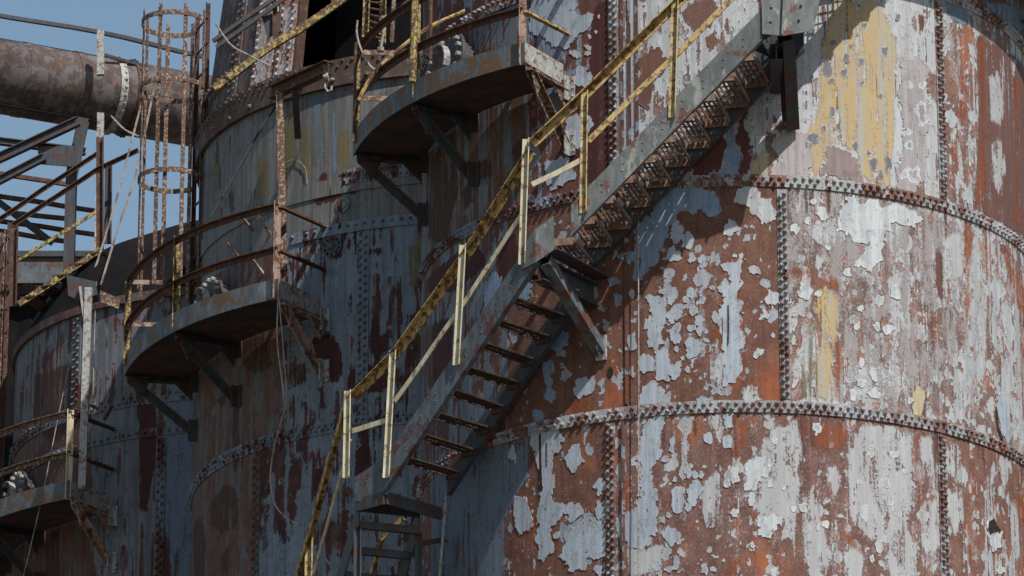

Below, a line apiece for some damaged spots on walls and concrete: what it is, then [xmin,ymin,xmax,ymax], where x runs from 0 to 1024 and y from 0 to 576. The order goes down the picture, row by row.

peeling [820,21,868,84]
rust [511,141,522,167]
rust [796,189,849,213]
rust [427,234,519,295]
peeling [431,56,1020,576]
rust [311,333,355,411]
rust [368,319,396,393]
rust [431,318,453,384]
rust [136,404,157,512]
rust [354,427,382,477]
rust [800,414,847,457]
rust [918,432,938,503]